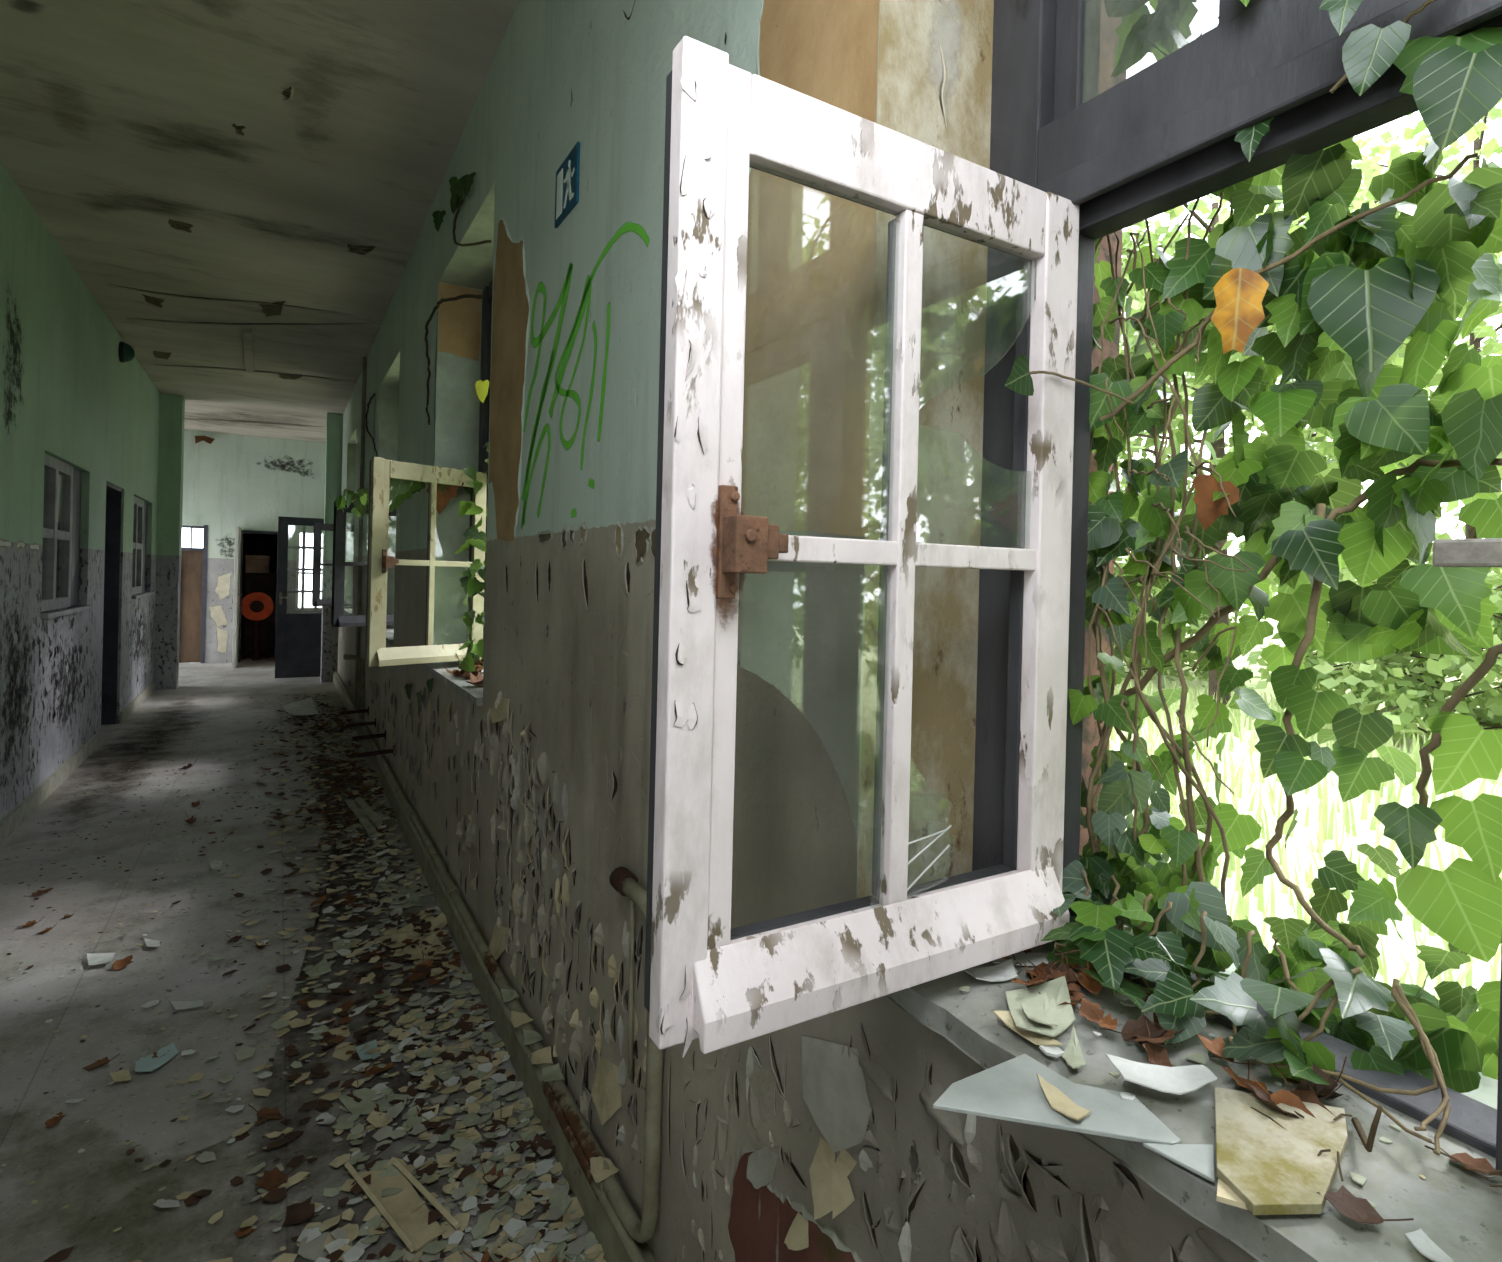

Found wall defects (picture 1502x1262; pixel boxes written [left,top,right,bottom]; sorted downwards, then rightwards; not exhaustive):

peeling [757,0,994,169]
peeling [438,217,531,542]
peeling [916,226,988,546]
rust [711,502,744,624]
damp [0,604,32,785]
damp [51,640,86,729]
peeling [858,565,880,898]
peeling [907,567,980,887]
peeling [332,860,455,1061]
peeling [456,691,694,1183]
peeling [1175,1235,1197,1262]